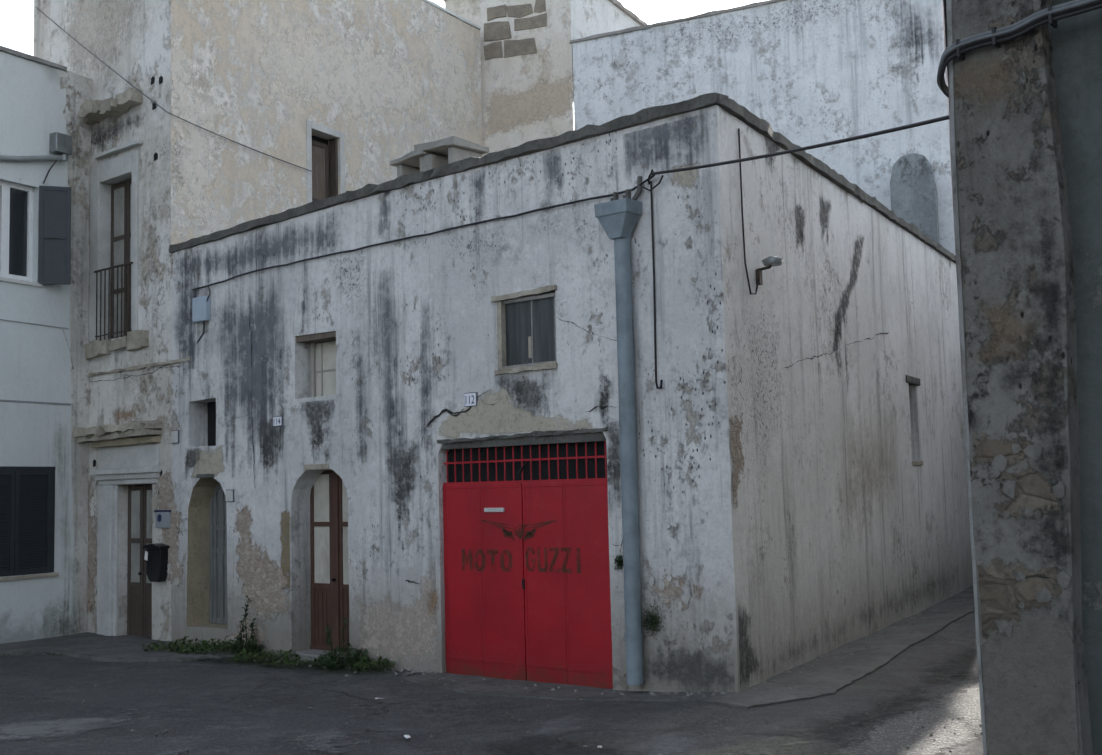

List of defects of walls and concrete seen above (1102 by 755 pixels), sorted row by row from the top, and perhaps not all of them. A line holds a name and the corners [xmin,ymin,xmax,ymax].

leakage [901,4,933,58]
peeling [172,42,229,231]
leakage [220,287,284,466]
leakage [380,284,416,528]
leakage [421,331,430,425]
crack [422,387,500,440]
flaking render [438,387,592,439]
leakage [499,373,548,420]
spalling [972,432,1066,524]
spalling [154,471,184,586]
spalling [228,500,291,649]
spalling [642,573,693,612]